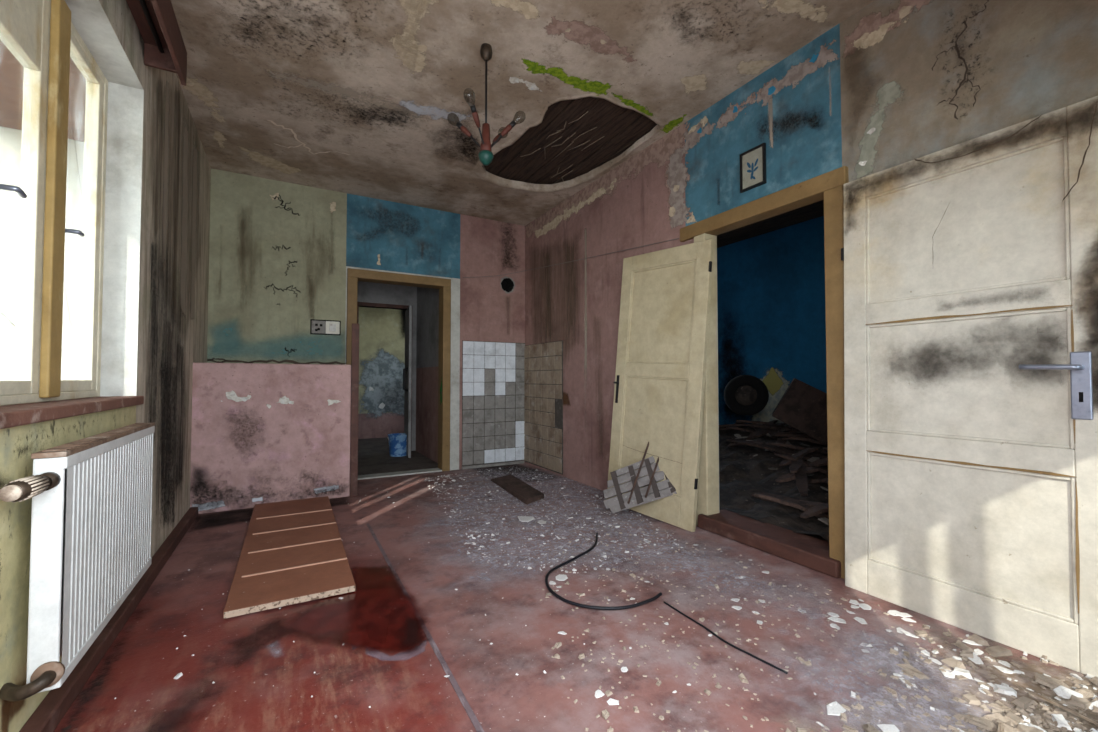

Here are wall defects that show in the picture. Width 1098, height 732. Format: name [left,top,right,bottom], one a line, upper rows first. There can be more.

crack [931,0,989,119]
spalling [473,0,931,243]
crack [272,195,300,216]
damp [149,82,274,524]
crack [264,245,301,305]
peeling [221,391,251,402]
peeling [359,349,405,417]